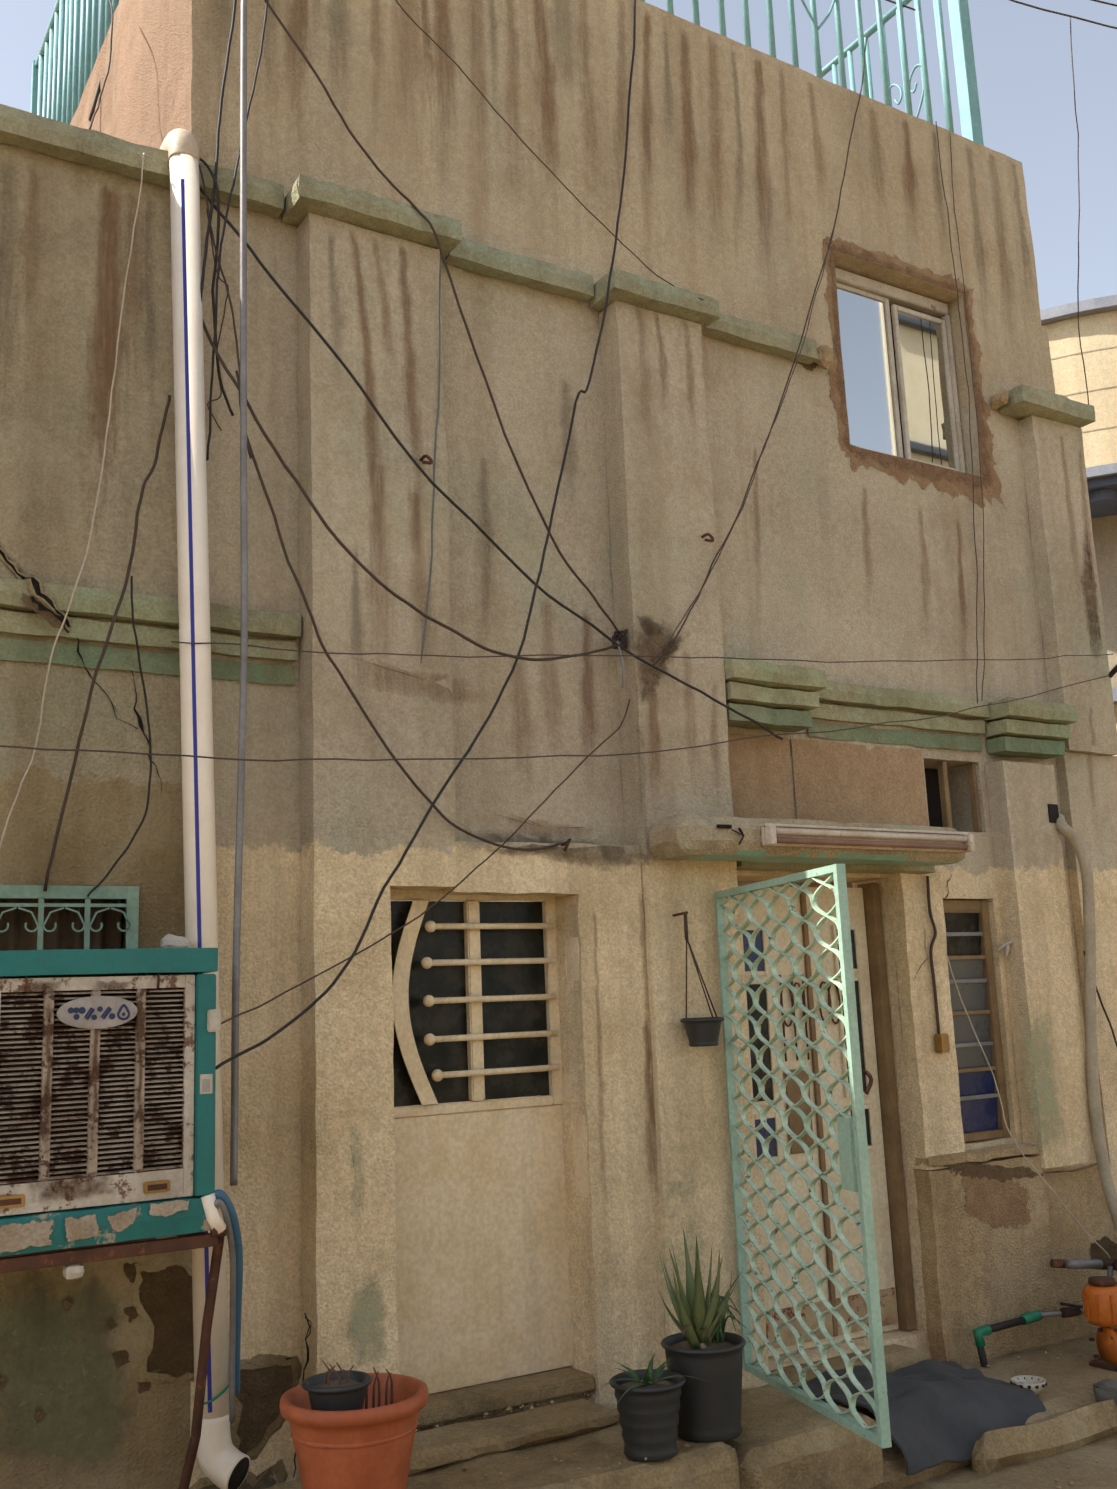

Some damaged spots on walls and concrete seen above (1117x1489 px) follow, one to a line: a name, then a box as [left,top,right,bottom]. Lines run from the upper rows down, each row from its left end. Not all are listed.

peeling [796,237,1009,508]
crack [0,547,162,792]
spalling [943,1162,1043,1229]
peeling [106,1251,194,1394]